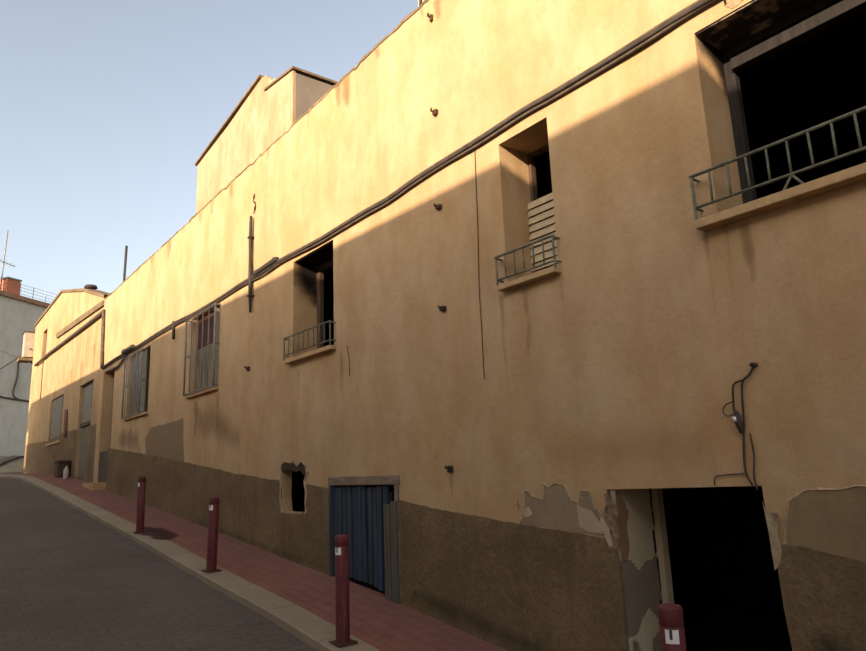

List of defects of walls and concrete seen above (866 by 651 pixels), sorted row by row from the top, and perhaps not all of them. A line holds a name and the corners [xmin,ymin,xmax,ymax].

flaking render [516,482,663,651]
flaking render [762,484,866,570]